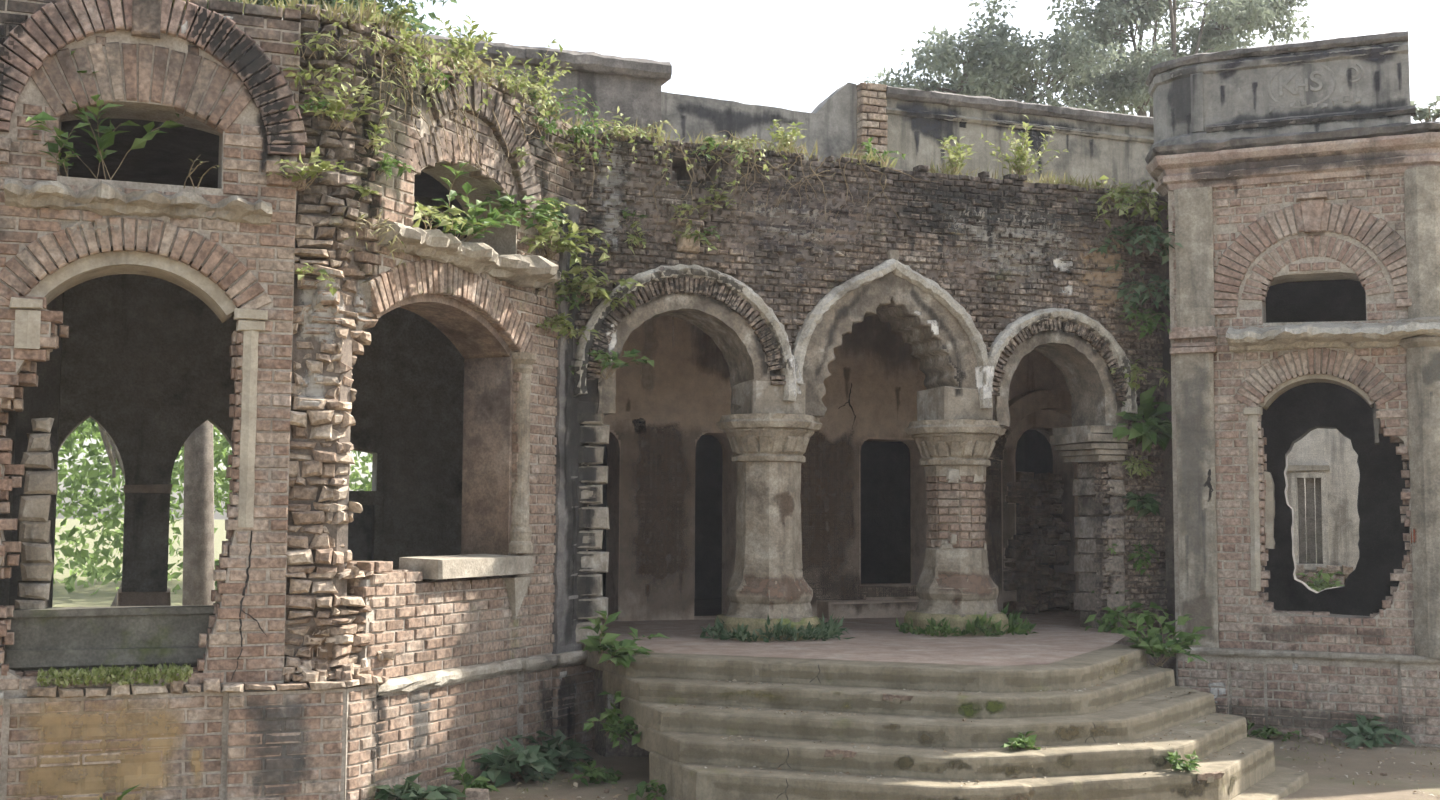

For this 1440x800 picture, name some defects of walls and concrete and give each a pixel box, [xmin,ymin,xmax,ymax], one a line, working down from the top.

damp [679,104,792,142]
flaking render [284,266,376,681]
damp [535,209,743,644]
crack [231,531,267,681]
damp [249,702,305,797]
damp [369,693,387,781]
damp [411,693,430,763]